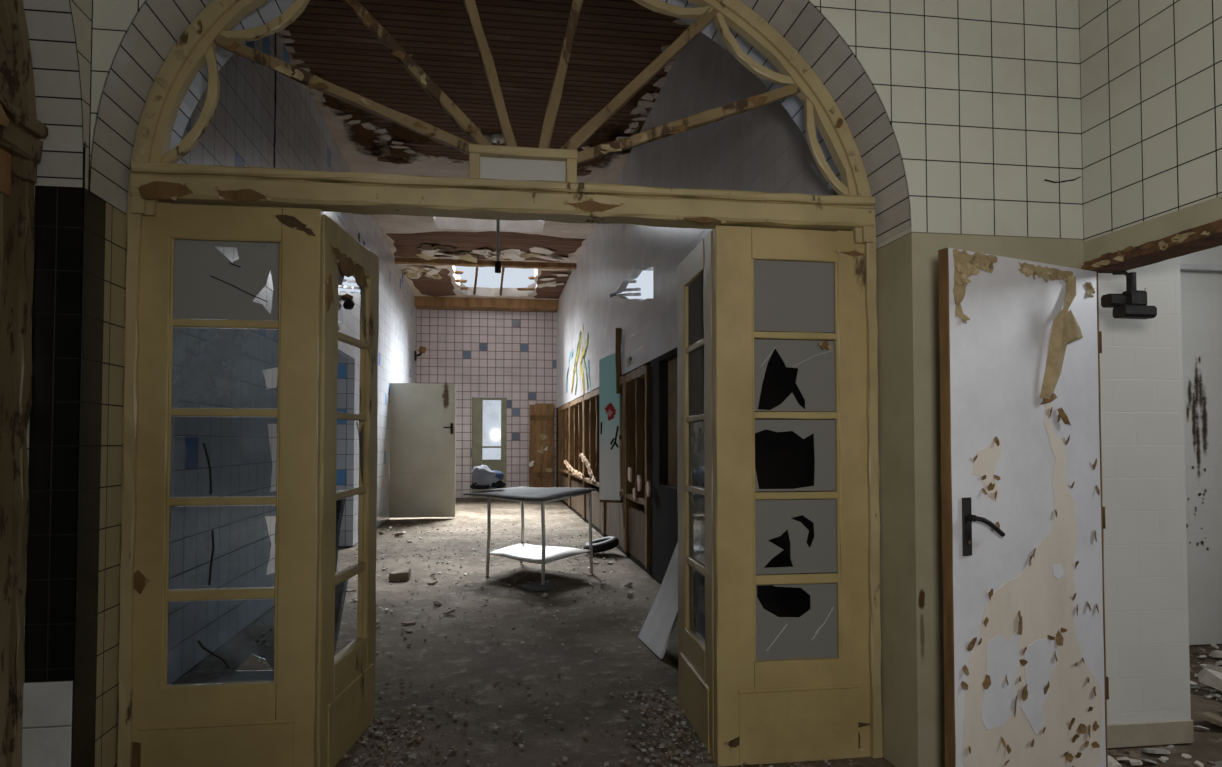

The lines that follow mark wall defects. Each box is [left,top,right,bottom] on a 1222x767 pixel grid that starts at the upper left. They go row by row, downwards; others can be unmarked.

flaking render [275,0,690,166]
flaking render [386,231,586,299]
peeling [564,200,625,212]
leakage [1187,357,1207,476]
peeling [961,392,1103,767]